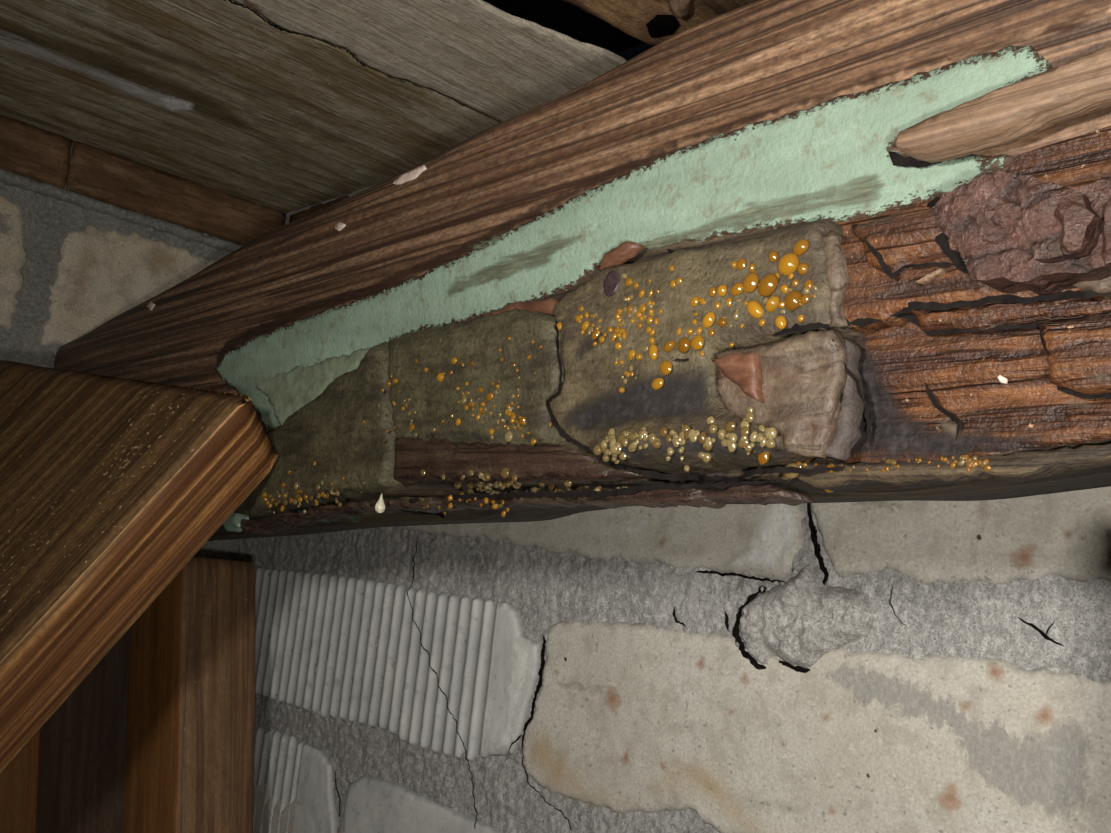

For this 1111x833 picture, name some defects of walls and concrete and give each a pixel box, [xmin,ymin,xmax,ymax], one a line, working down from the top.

crack [224,0,500,123]
crack [807,503,829,586]
crack [407,538,478,828]
crack [508,635,572,831]
crack [672,607,686,626]
crack [696,570,810,673]
crack [1017,617,1064,647]